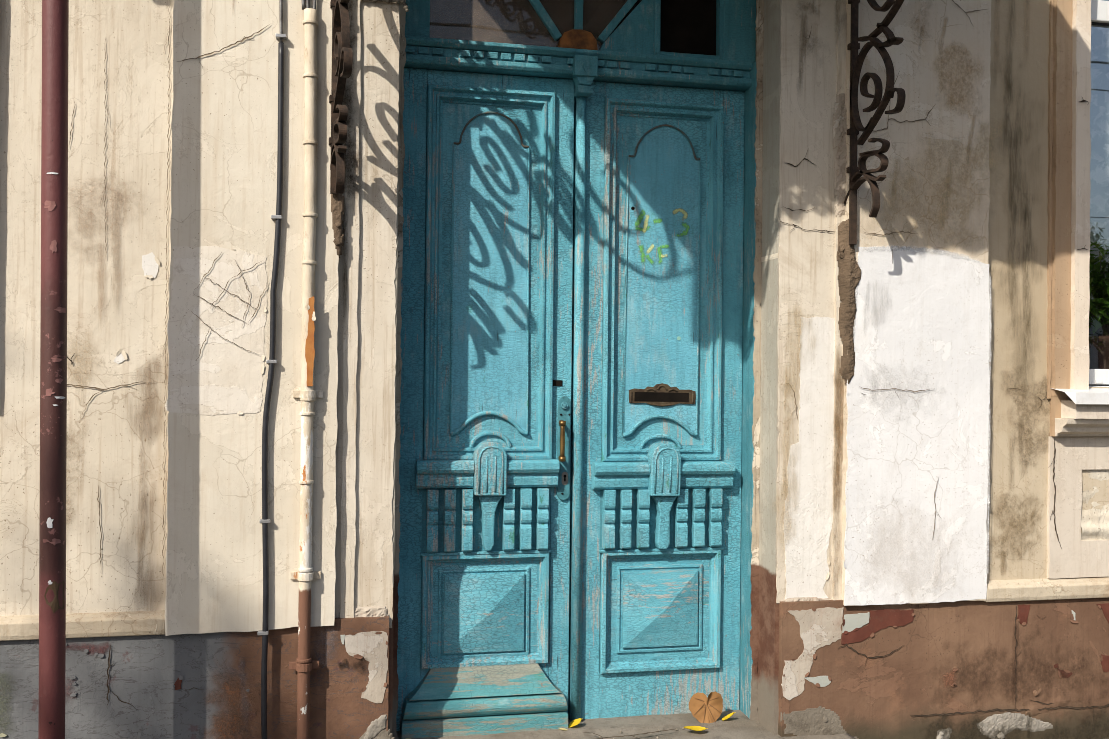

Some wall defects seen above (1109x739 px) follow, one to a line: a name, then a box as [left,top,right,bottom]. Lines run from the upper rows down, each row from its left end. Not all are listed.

crack [877,71,935,131]
peeling [142,252,160,279]
crack [67,10,267,576]
crack [1048,438,1061,547]
flaking render [339,606,394,739]
flaking render [780,597,915,739]